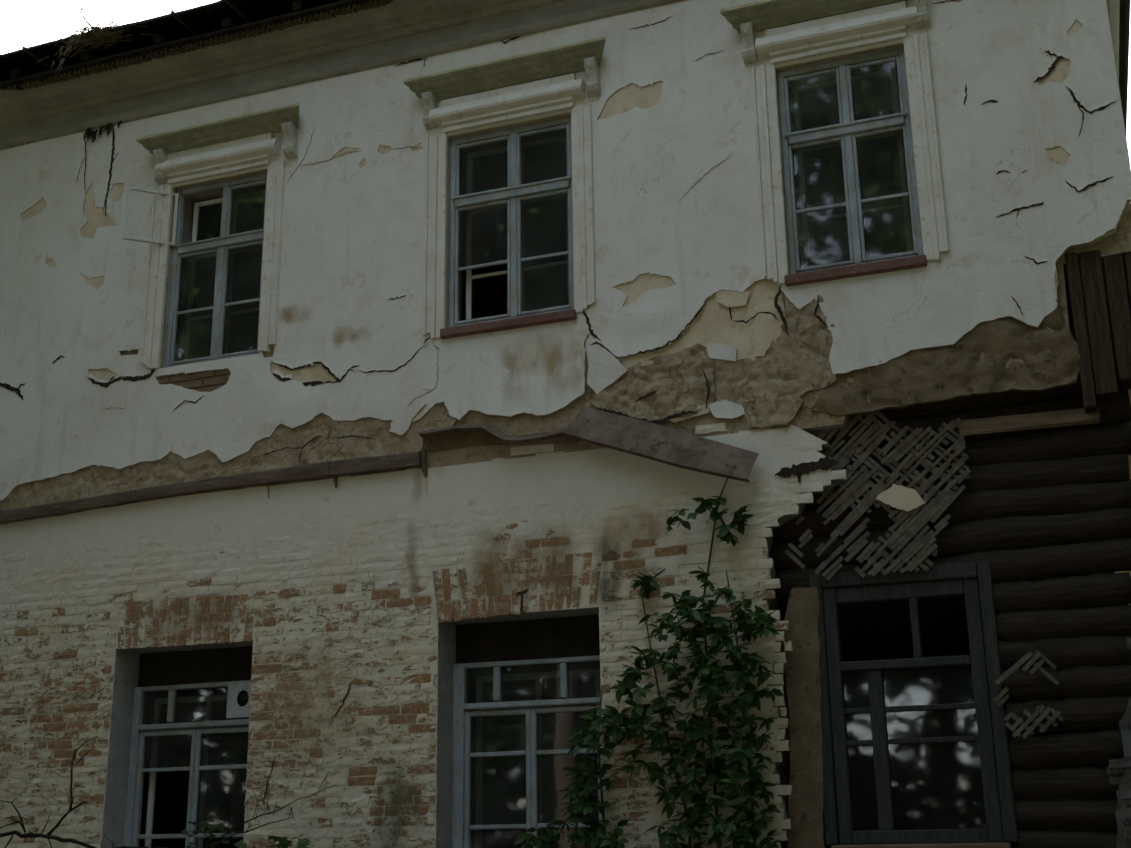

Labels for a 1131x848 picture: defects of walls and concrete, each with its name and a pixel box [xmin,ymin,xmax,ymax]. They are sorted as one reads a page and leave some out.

spalling [598,82,663,120]
crack [1032,50,1117,137]
crack [76,125,117,216]
crack [994,167,1027,175]
crack [1065,174,1114,192]
spalling [81,182,125,239]
crack [995,197,1044,217]
spalling [613,271,676,306]
spalling [157,355,247,392]
spalling [589,280,1081,429]
spalling [0,403,458,510]
crack [329,685,351,726]